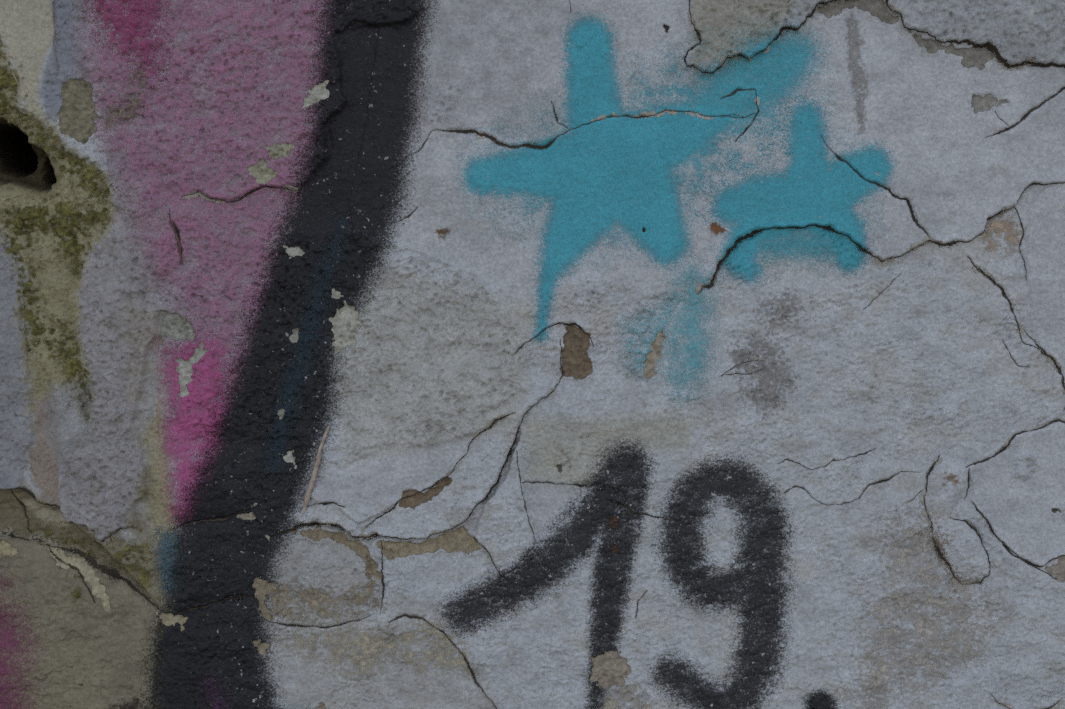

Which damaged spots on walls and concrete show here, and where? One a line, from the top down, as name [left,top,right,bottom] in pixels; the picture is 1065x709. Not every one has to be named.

crack [387,88,760,172]
crack [683,0,847,74]
spalling [817,0,997,70]
crack [885,0,1065,138]
spalling [971,94,1010,113]
spalling [559,325,593,381]
crack [695,135,1065,587]
spalling [0,540,20,557]
spalling [44,546,112,612]
crack [0,488,163,612]
crack [265,323,684,709]
peeling [156,611,188,631]